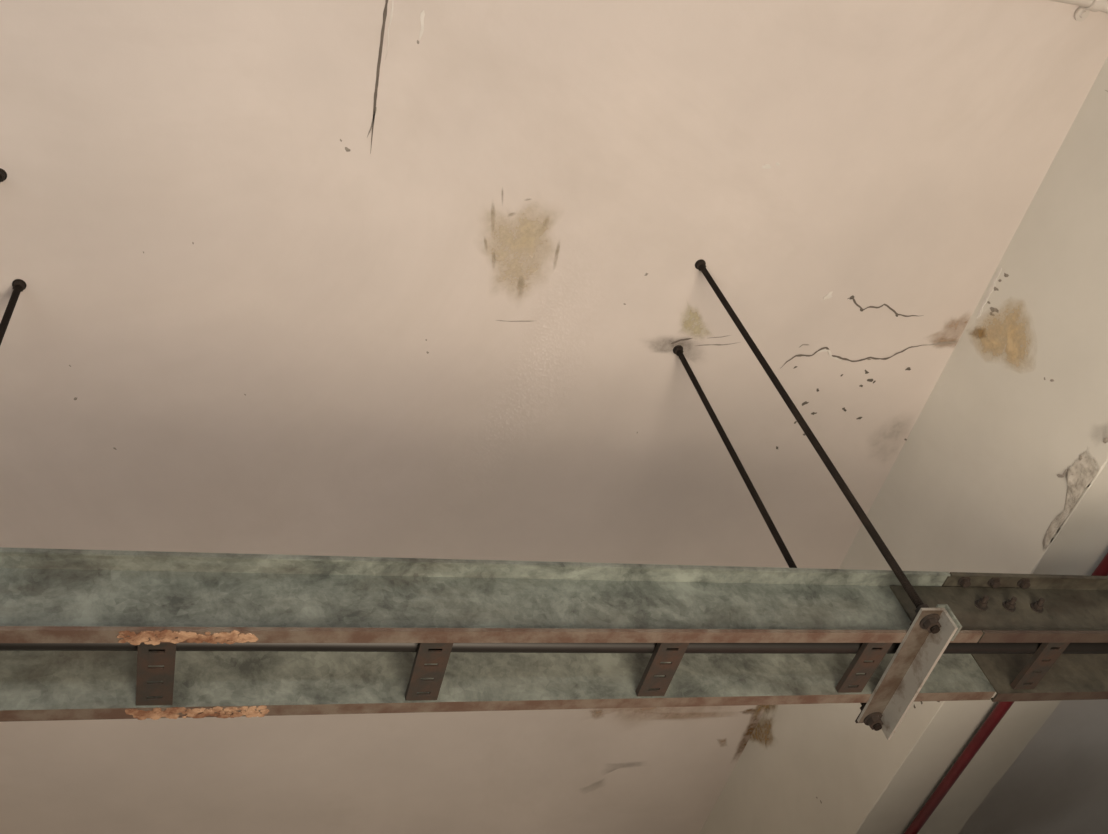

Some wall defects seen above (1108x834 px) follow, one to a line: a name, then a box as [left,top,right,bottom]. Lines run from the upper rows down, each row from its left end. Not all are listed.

crack [367,0,394,154]
crack [823,292,924,317]
crack [781,342,956,368]
spalling [1042,452,1098,548]